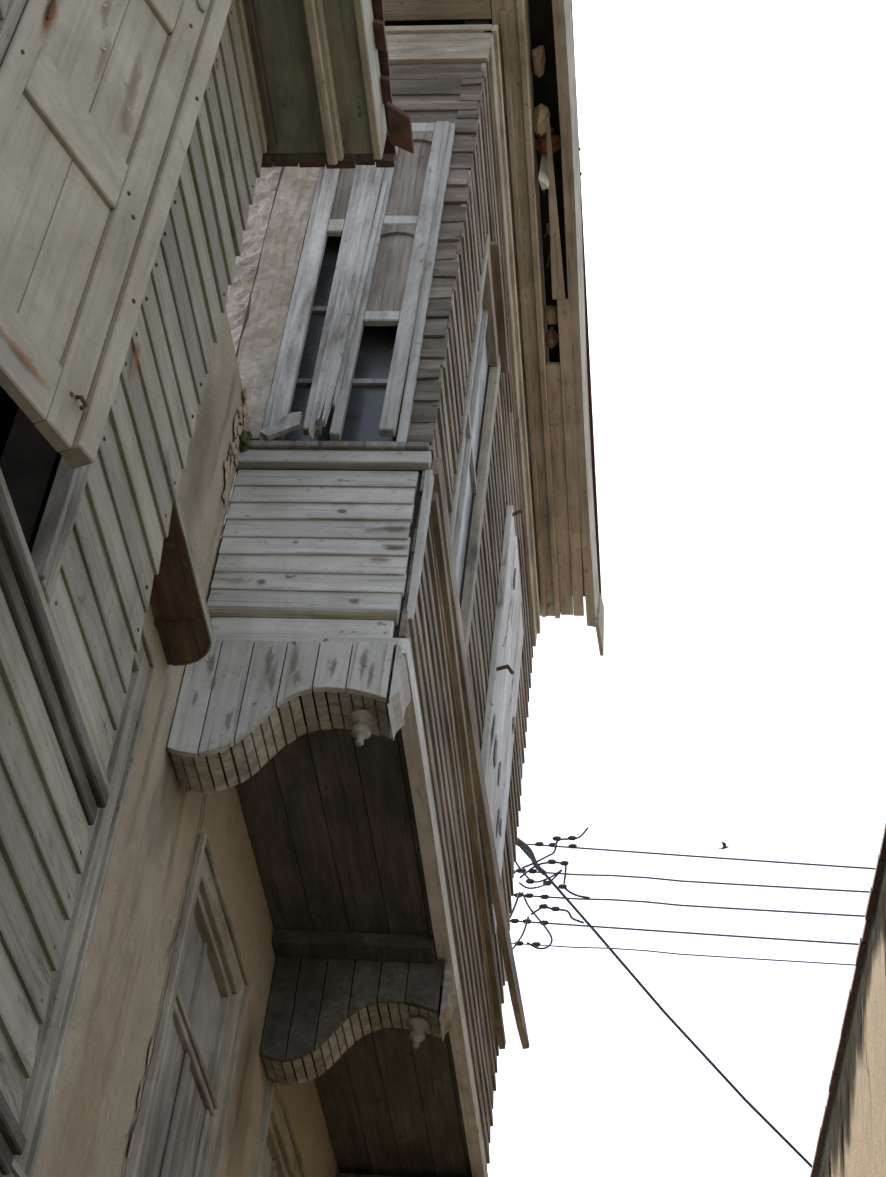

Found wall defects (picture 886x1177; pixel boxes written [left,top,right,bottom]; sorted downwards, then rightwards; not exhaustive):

crack [124,793,208,1177]